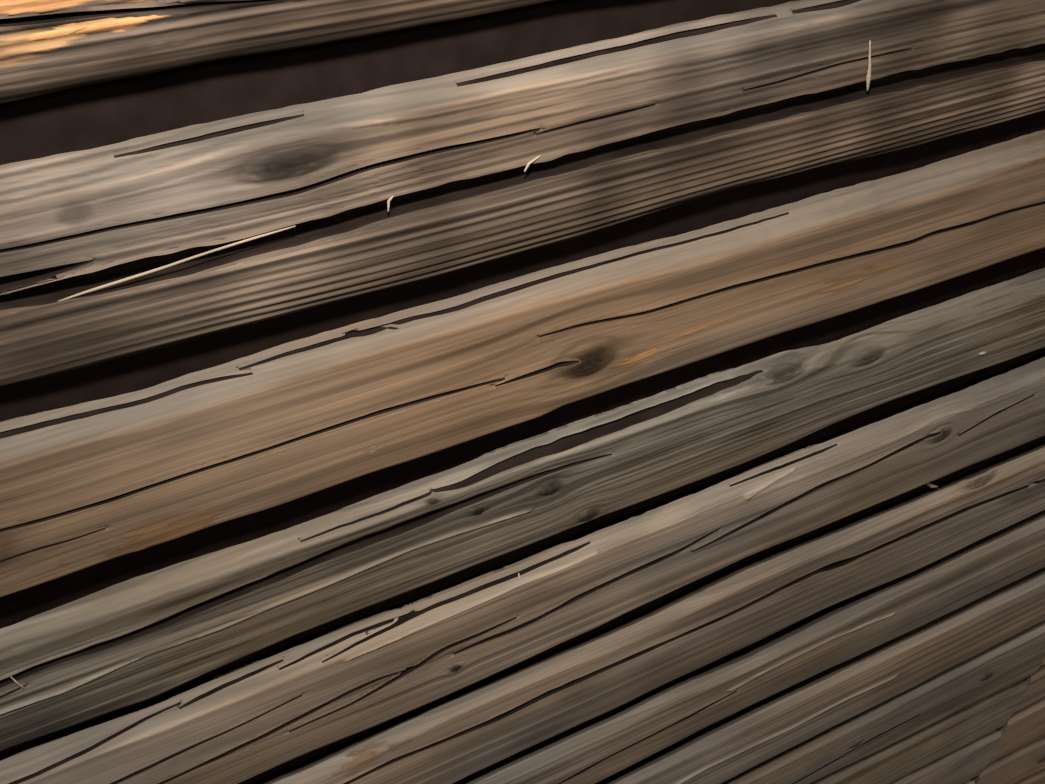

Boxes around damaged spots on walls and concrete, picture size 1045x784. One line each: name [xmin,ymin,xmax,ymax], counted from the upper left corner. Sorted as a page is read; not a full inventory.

crack [0,0,302,32]
crack [0,40,1045,314]
crack [455,0,877,90]
crack [0,199,1045,565]
crack [0,539,592,784]
crack [0,367,765,701]
crack [105,392,1045,784]